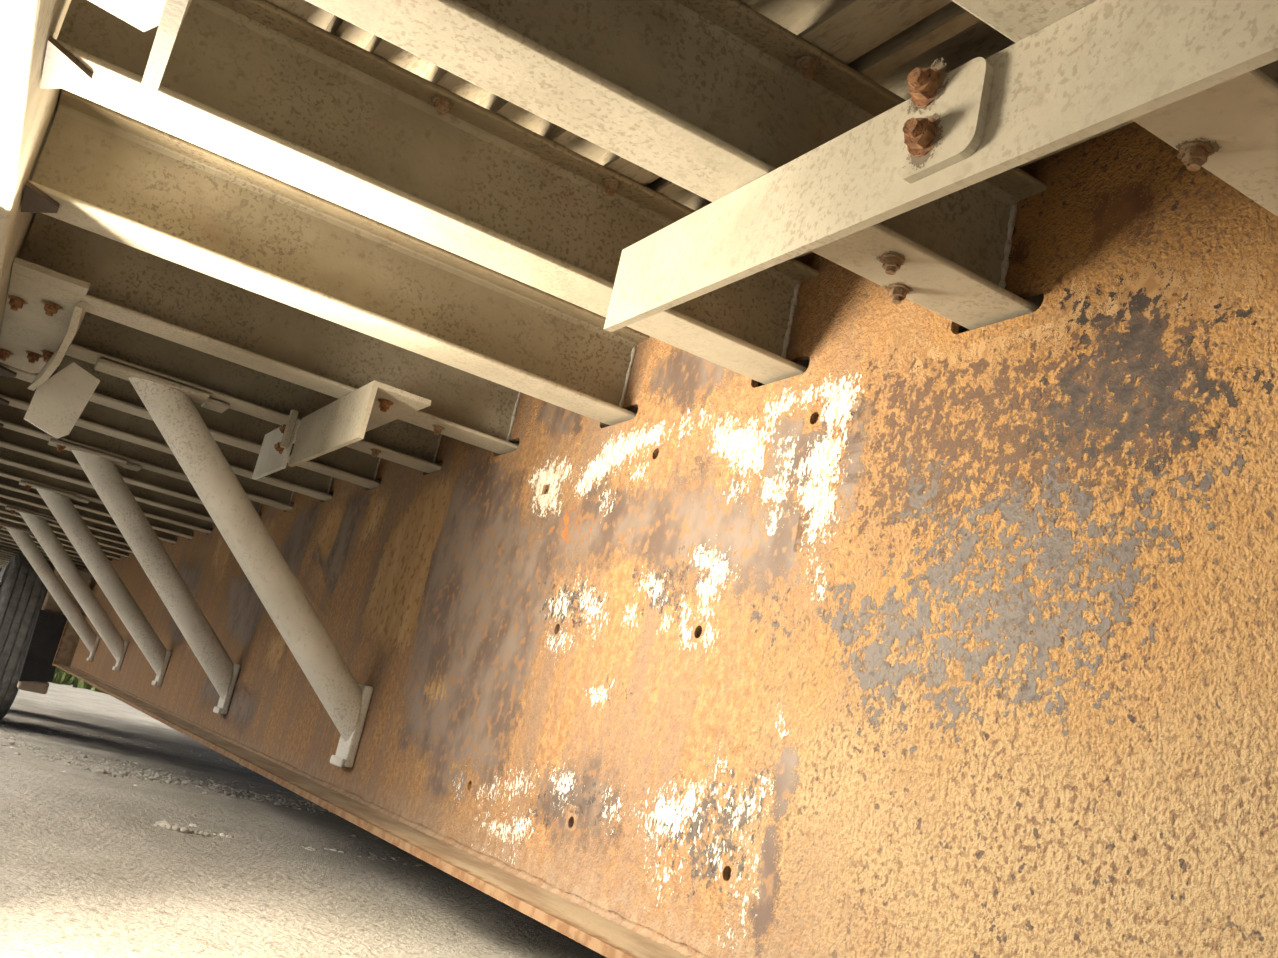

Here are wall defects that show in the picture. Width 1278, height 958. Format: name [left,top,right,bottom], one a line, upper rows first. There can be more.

corrosion [211,533,231,586]
corrosion [315,499,347,564]
corrosion [354,463,461,663]
corrosion [543,505,602,544]
corrosion [808,232,1278,757]
corrosion [263,632,287,678]
corrosion [747,737,802,956]